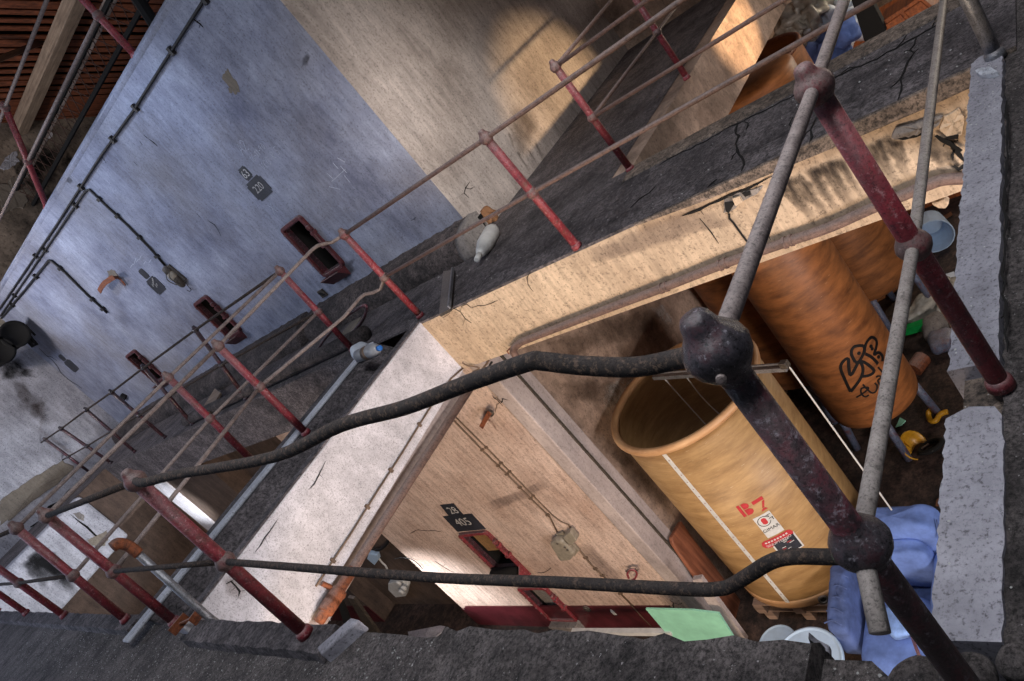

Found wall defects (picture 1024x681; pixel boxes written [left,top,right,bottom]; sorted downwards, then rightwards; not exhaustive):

peeling [222,68,240,95]
crack [835,18,936,101]
crack [630,95,817,244]